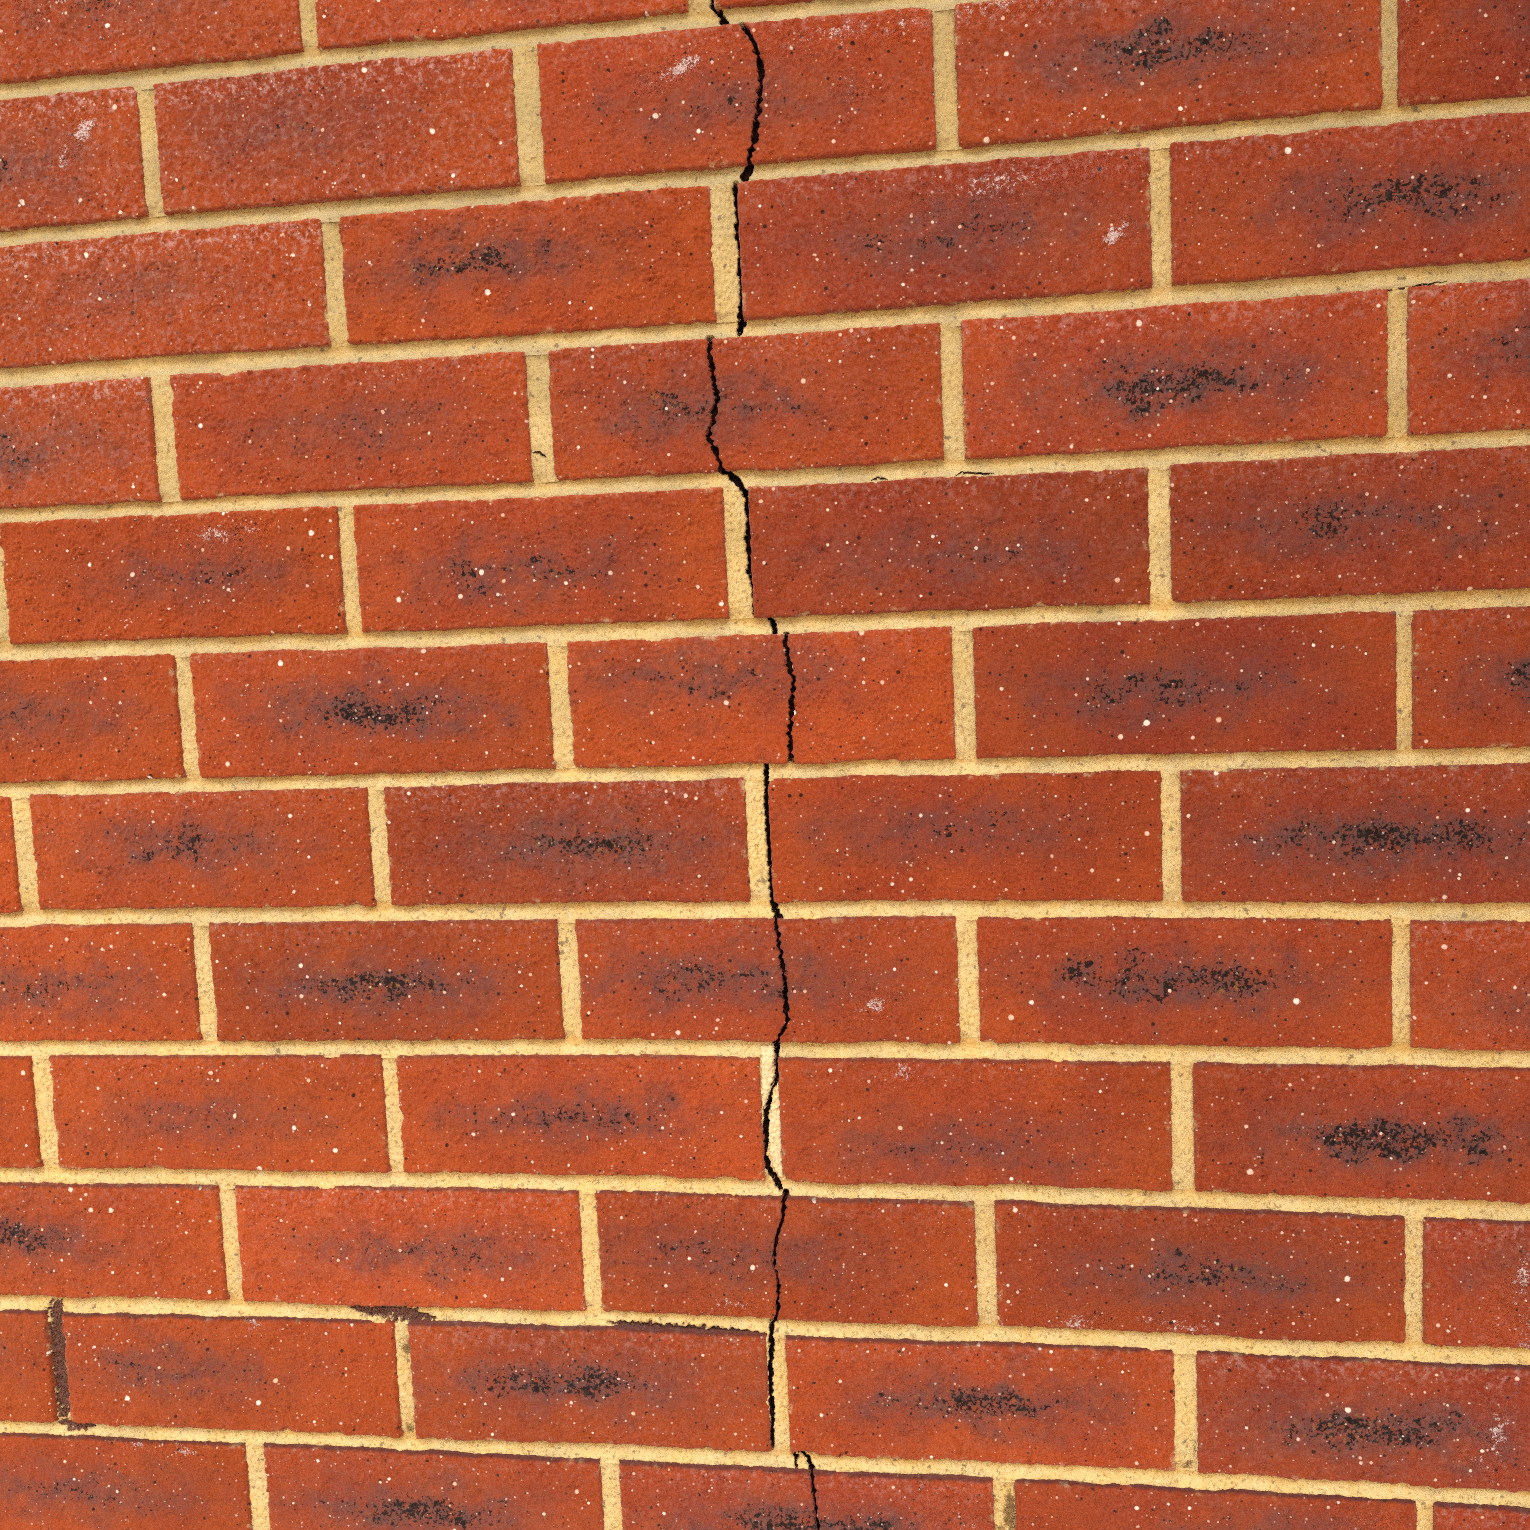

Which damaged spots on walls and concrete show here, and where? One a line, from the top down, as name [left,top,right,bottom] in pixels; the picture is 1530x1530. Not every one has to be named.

crack [706,0,820,1530]